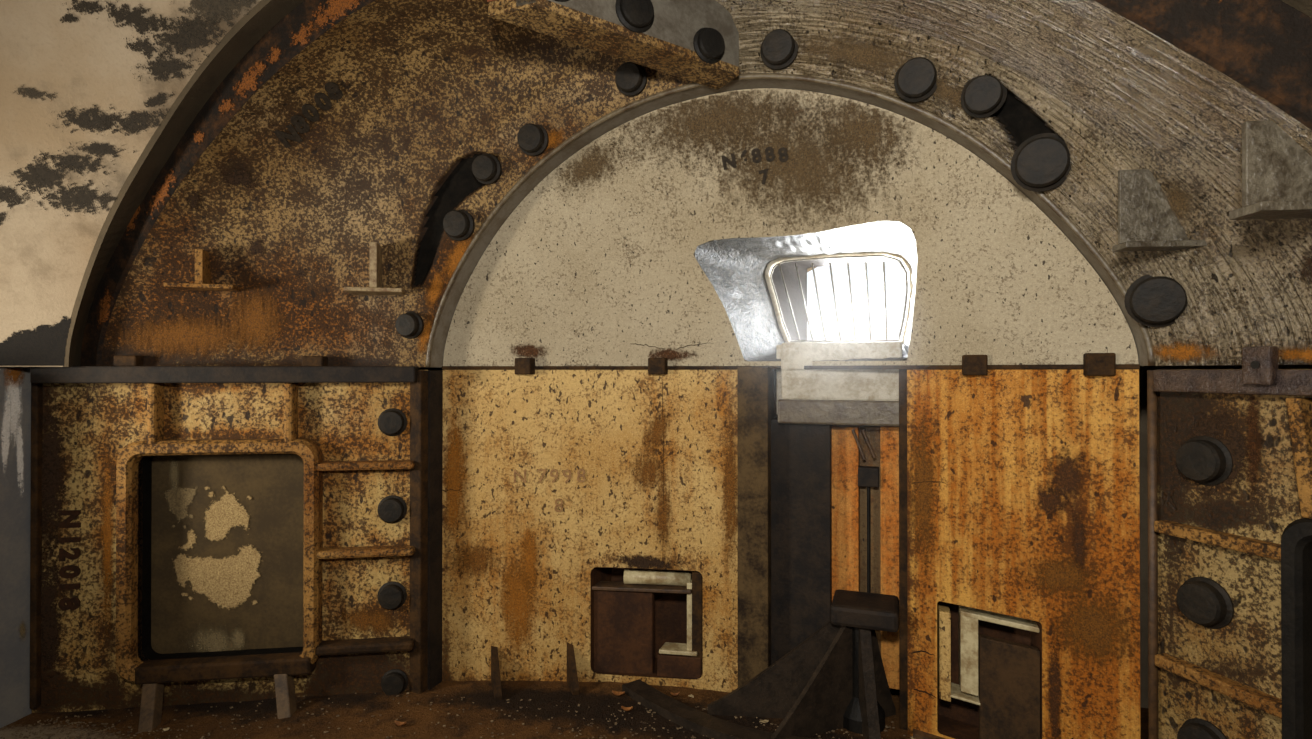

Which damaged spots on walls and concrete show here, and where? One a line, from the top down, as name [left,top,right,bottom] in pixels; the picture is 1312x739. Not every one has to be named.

peeling [126,162,179,236]
corrosion [250,239,265,257]
corrosion [418,239,471,351]
corrosion [511,344,546,358]
corrosion [41,383,69,706]
peeling [164,485,262,609]
corrosion [445,418,538,652]
corrosion [616,412,681,569]
corrosion [722,414,738,561]
corrosion [1033,448,1086,568]
corrosion [1244,394,1263,498]
corrosion [1048,640,1061,739]